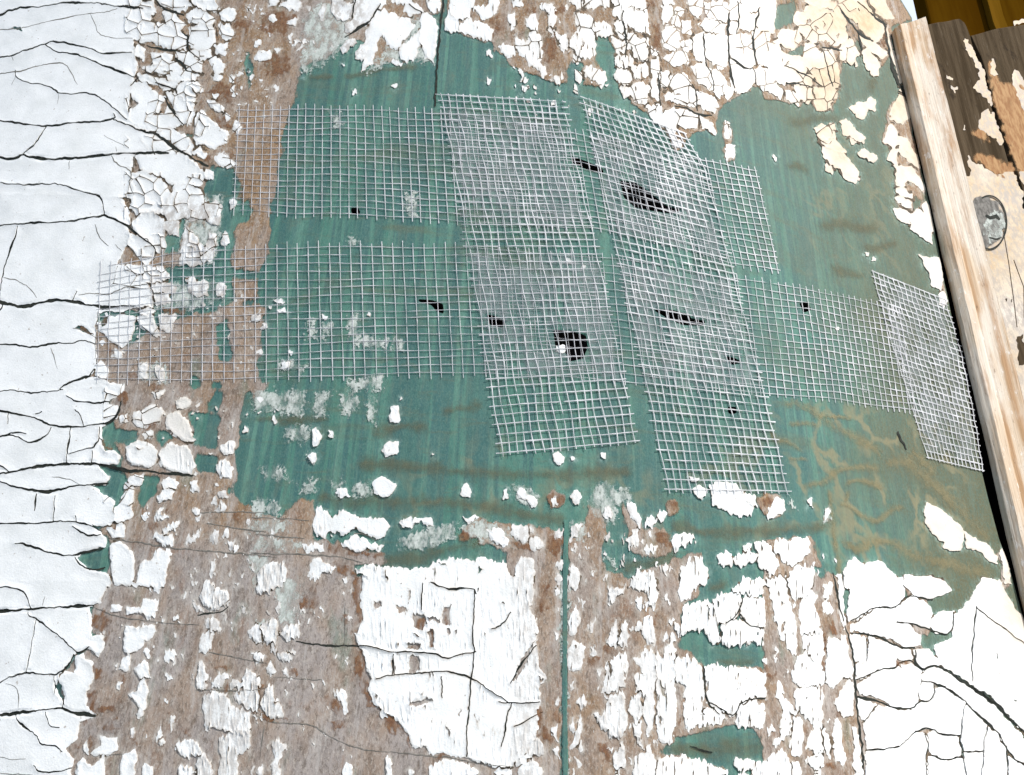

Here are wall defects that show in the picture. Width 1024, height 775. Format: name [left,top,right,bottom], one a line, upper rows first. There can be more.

peeling [0,0,911,272]
crack [509,0,907,179]
peeling [882,89,934,244]
peeling [918,254,948,308]
crack [0,0,542,775]
peeling [0,150,564,775]
peeling [553,451,575,465]
peeling [548,489,582,508]
peeling [689,476,786,520]
crack [595,624,621,724]
peeling [567,499,1024,775]
crack [627,542,1024,775]